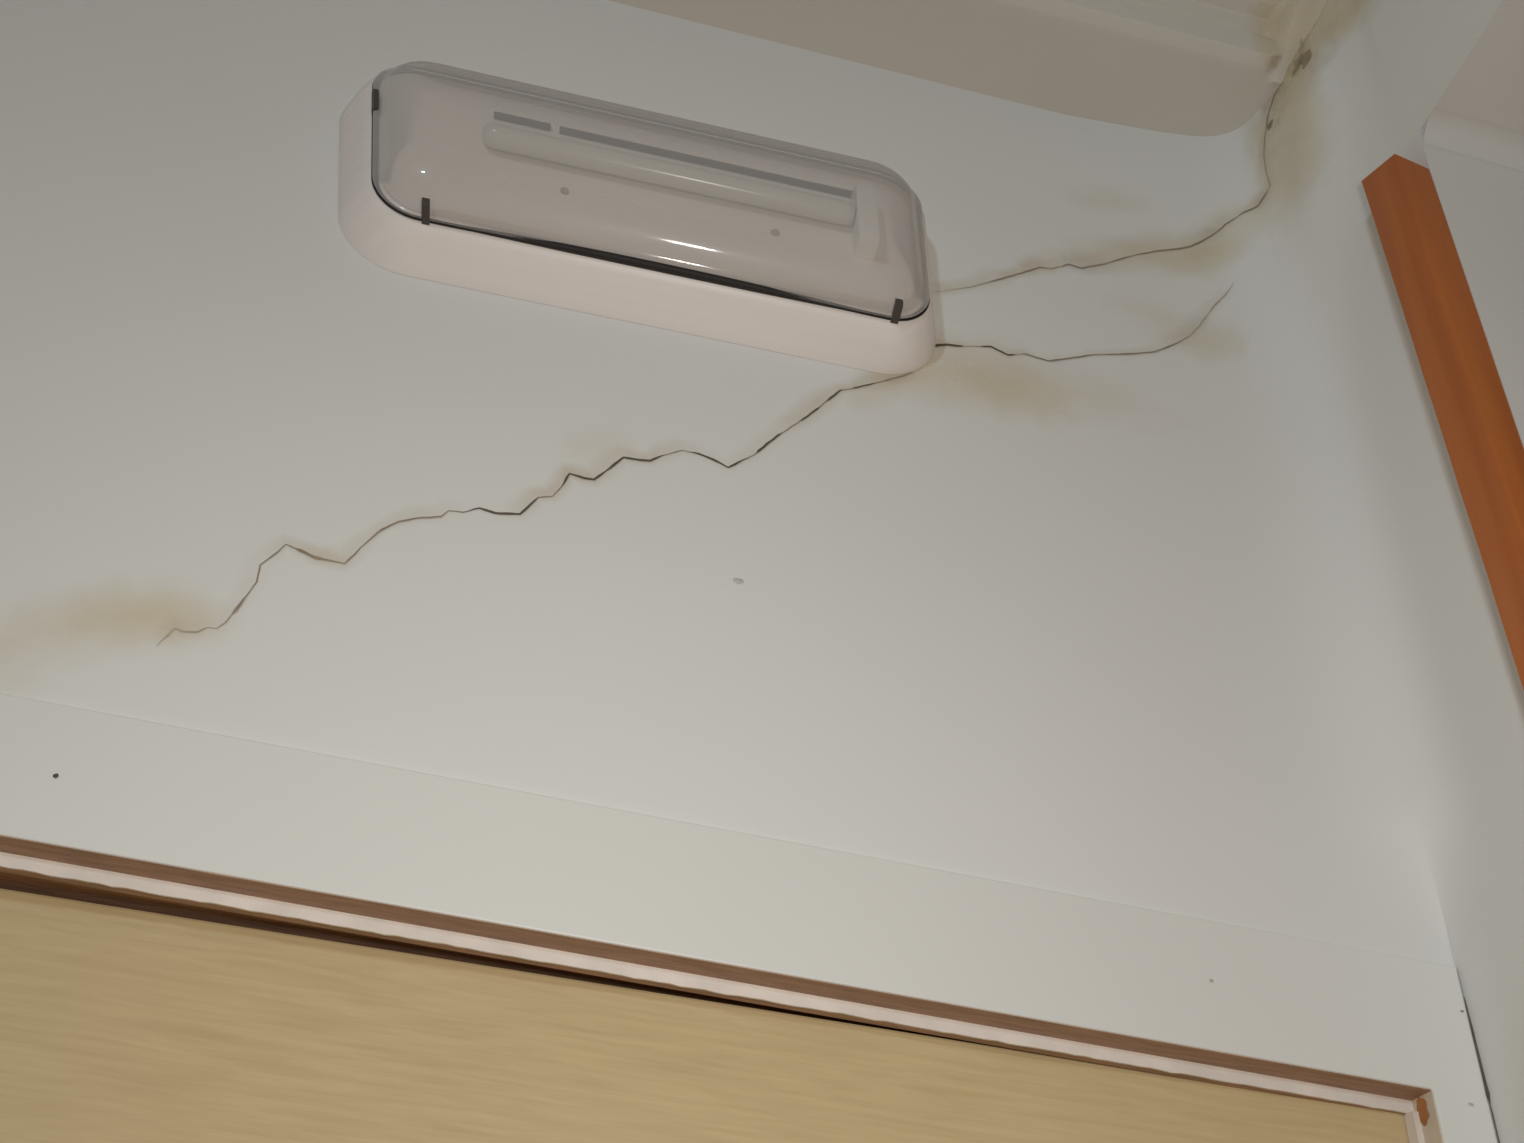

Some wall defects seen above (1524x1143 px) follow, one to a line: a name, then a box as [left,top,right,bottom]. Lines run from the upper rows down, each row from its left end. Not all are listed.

crack [937,39,1302,292]
crack [157,283,1234,645]